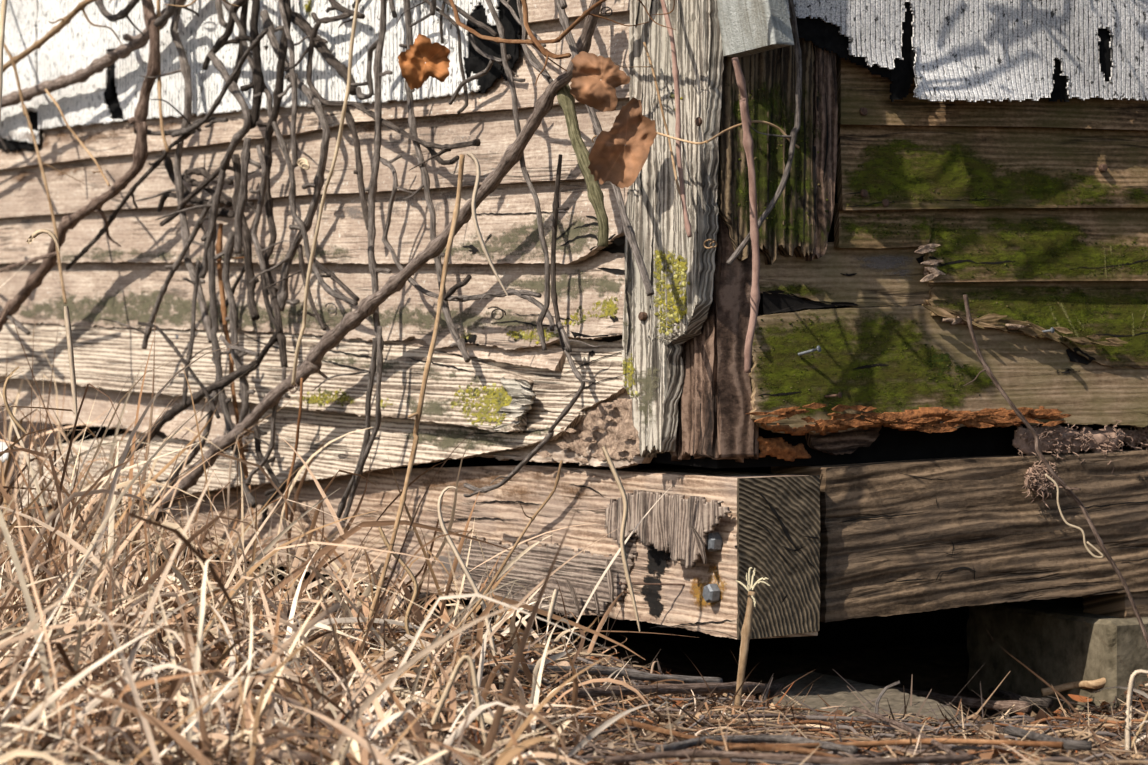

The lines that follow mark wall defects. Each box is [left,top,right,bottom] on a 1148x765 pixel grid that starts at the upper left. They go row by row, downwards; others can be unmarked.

peeling [746,403,1071,433]
peeling [459,490,732,618]